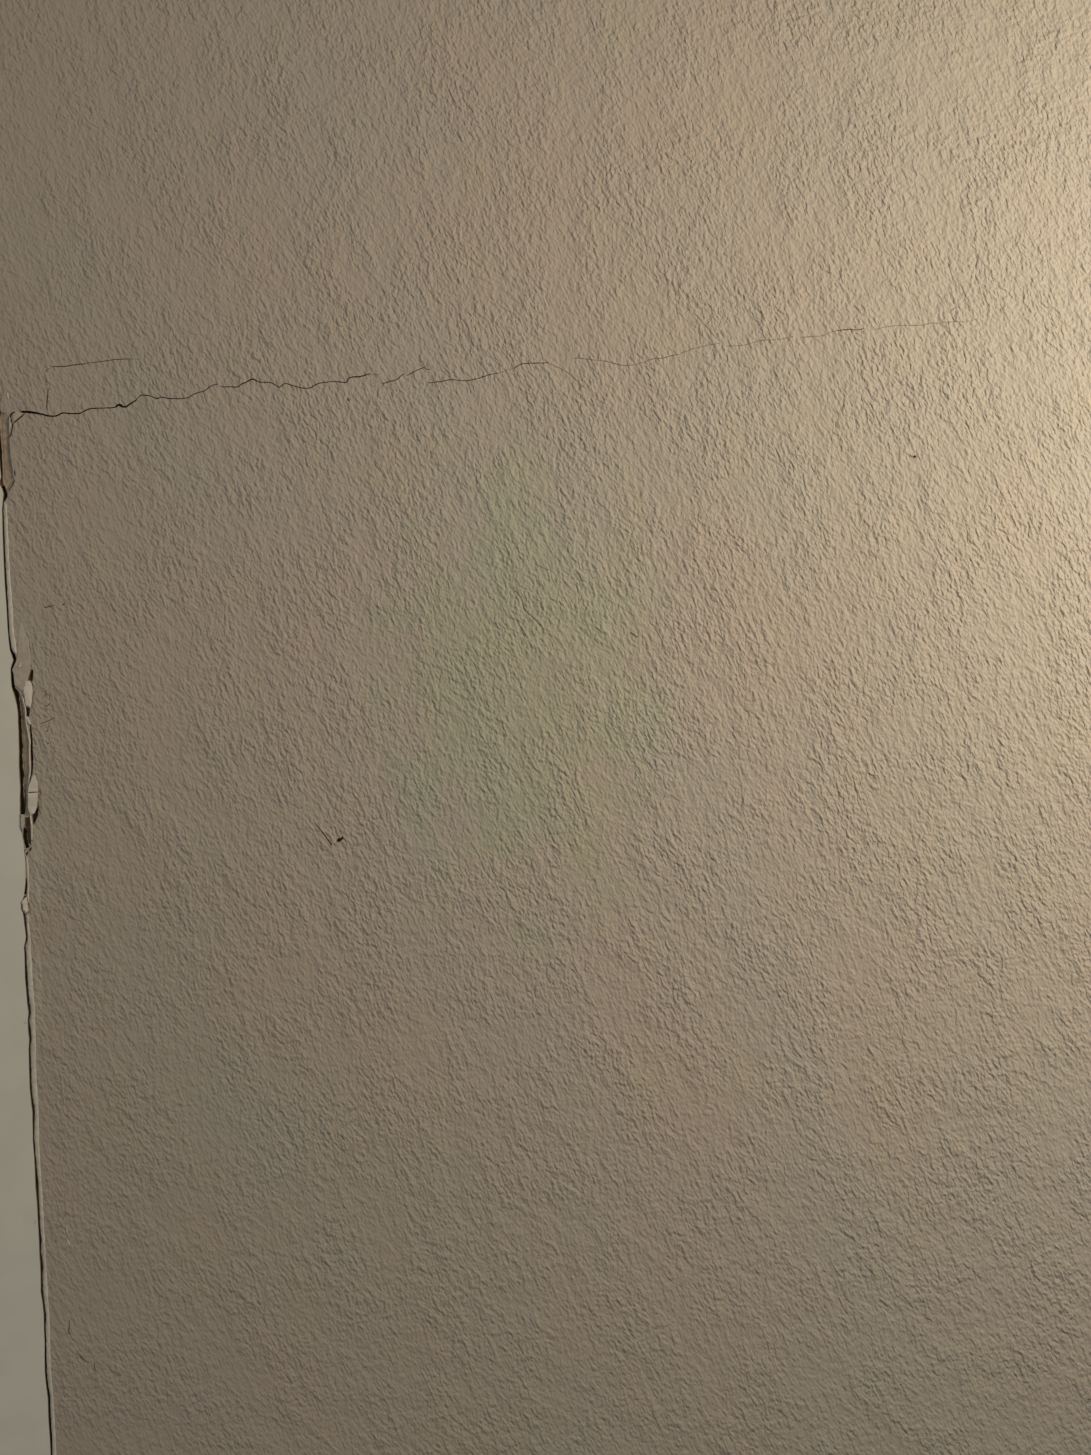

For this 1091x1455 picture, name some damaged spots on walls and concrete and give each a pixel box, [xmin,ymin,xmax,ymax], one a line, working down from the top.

peeling [12,622,39,856]
crack [0,315,977,1450]